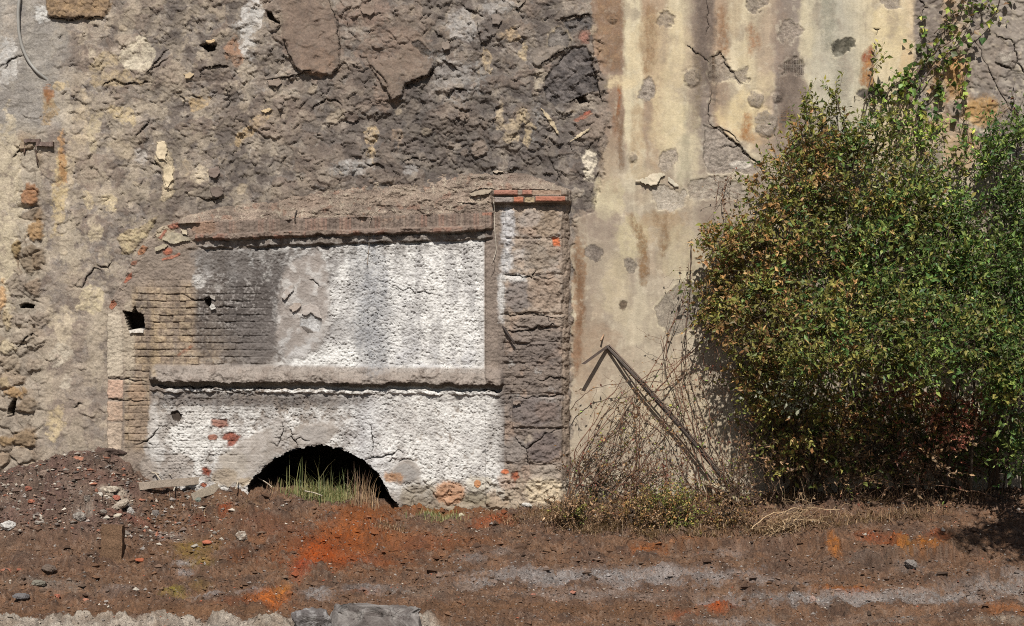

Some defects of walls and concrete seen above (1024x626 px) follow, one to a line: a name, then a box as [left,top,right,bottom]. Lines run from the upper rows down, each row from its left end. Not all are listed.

flaking render [46,0,110,19]
flaking render [832,38,855,57]
flaking render [637,77,655,101]
crack [708,91,762,170]
peeling [154,140,175,201]
flaking render [635,125,759,211]
spalling [124,222,187,283]
flaking render [585,245,603,262]
water stain [635,229,648,278]
flaking render [282,285,322,333]
flaking render [655,281,702,336]
flaking render [208,419,240,446]